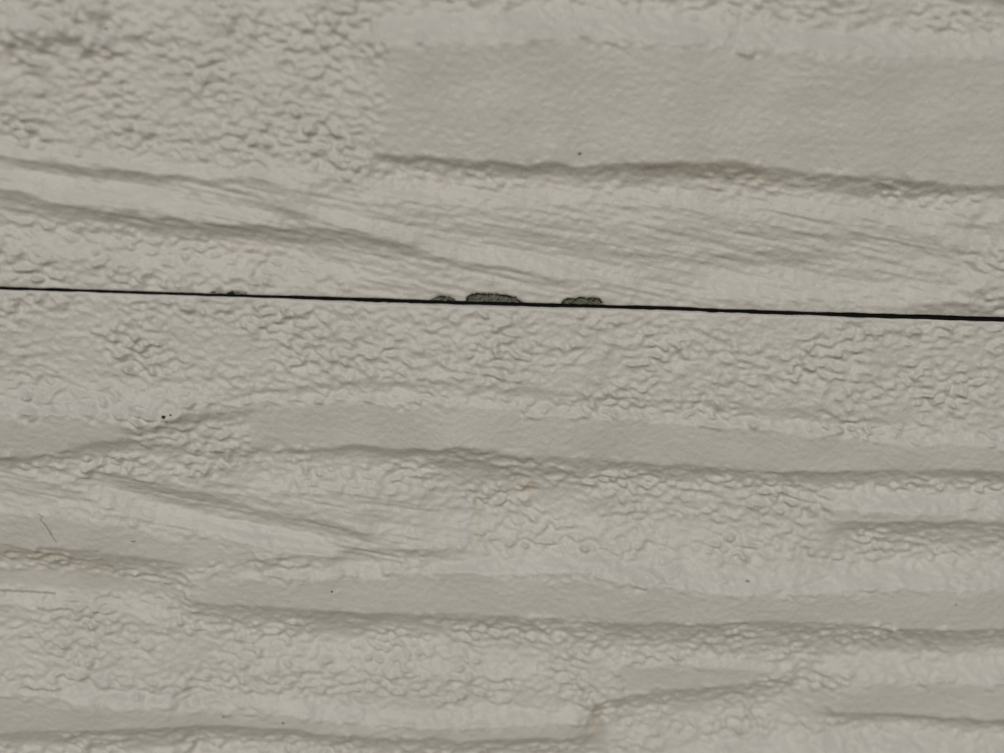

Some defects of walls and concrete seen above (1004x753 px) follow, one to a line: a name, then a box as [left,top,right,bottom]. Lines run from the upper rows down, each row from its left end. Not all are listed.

spalling [433,293,521,302]
spalling [562,297,602,305]